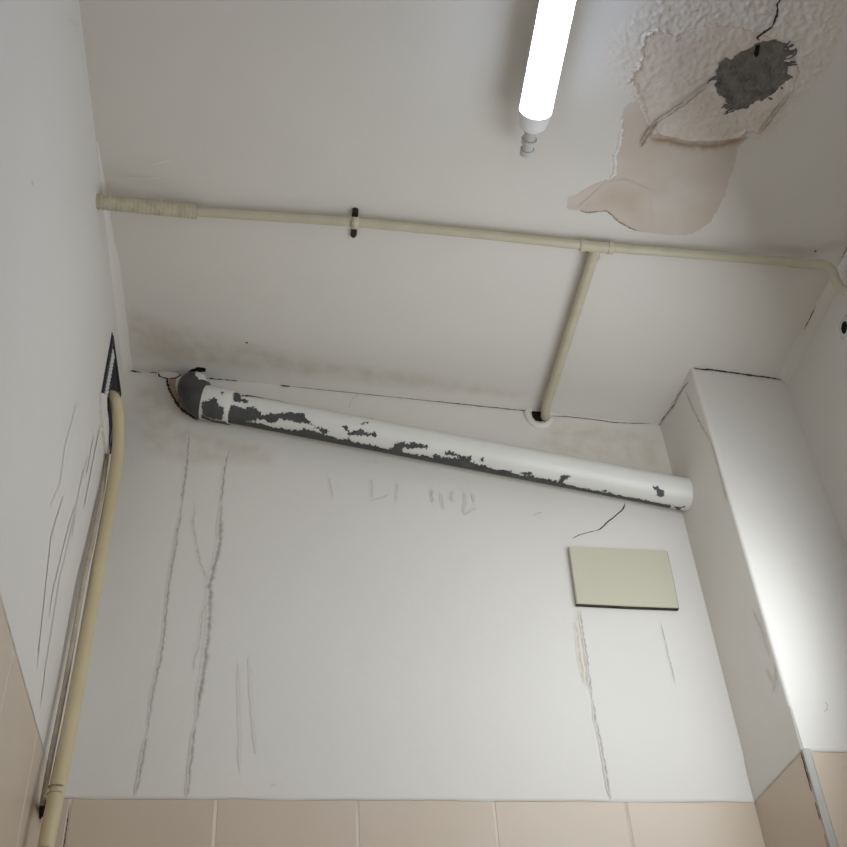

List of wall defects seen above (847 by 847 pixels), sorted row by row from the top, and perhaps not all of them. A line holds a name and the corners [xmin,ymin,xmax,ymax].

flaking render [567,0,846,236]
peeling [158,367,685,510]
crack [572,504,625,539]